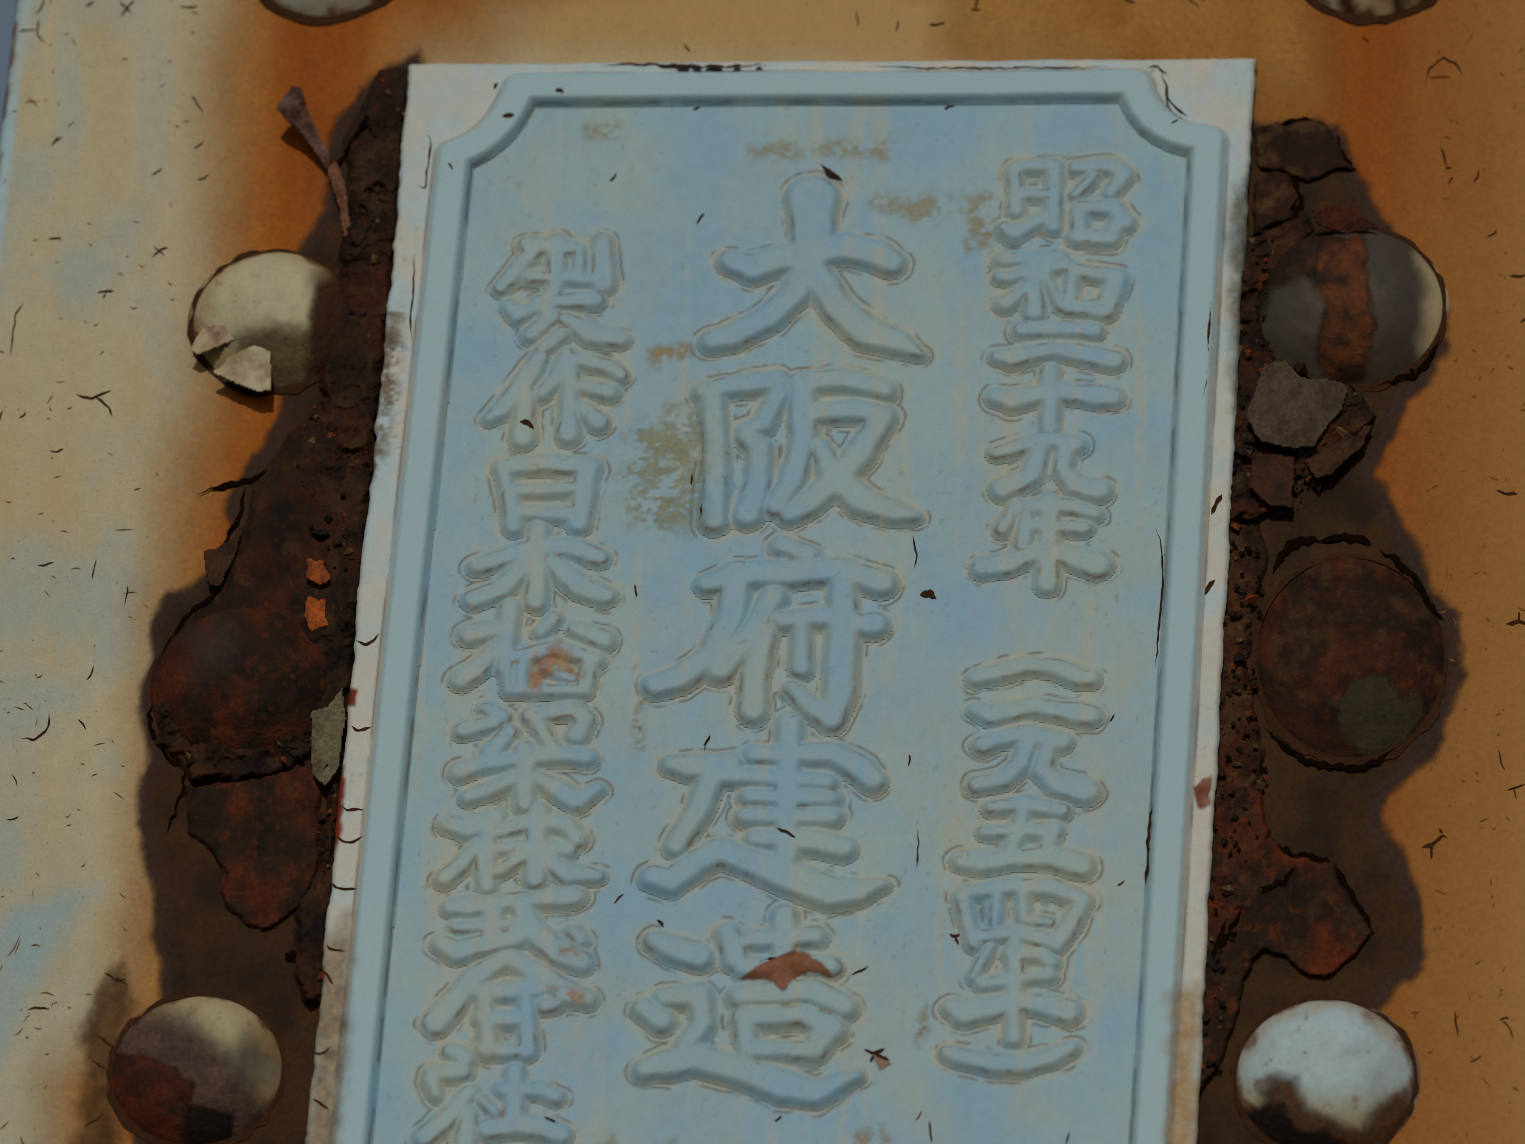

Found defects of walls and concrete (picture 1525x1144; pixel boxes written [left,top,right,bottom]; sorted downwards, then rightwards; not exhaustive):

corrosion [54,0,504,1144]
peeling [334,766,344,850]
peeling [348,689,357,705]
corrosion [960,0,1507,1144]